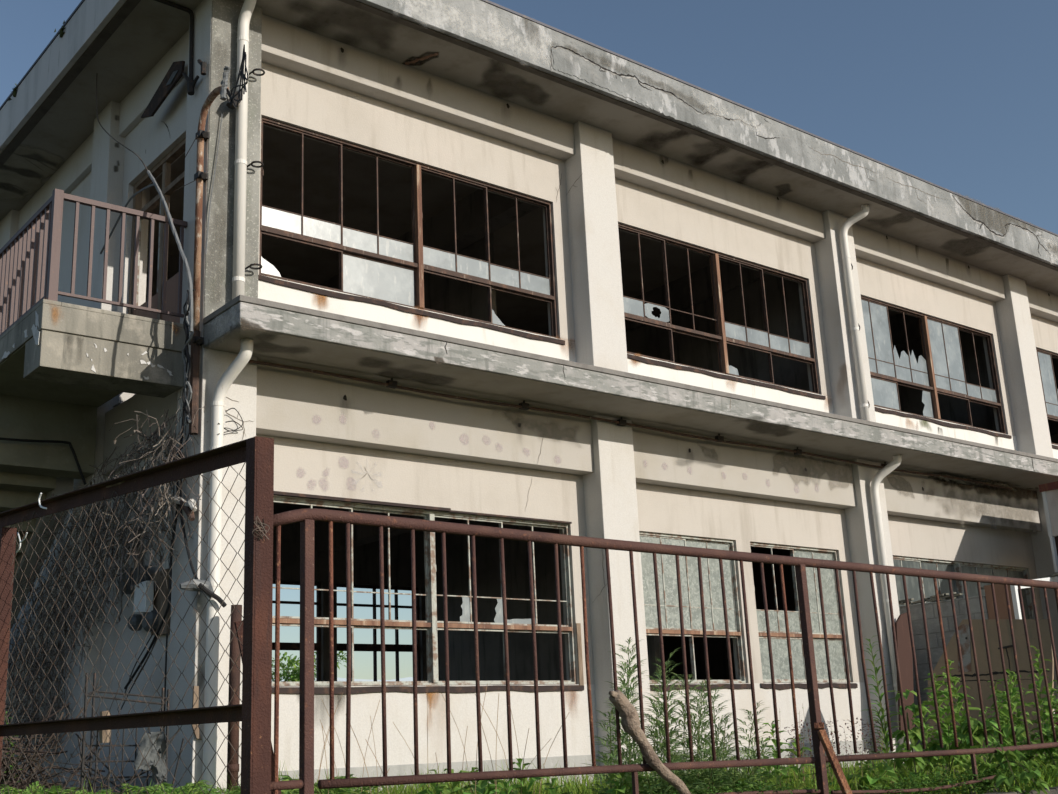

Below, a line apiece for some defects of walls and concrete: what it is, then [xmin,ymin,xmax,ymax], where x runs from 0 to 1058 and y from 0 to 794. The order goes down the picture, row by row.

damp [483,61,548,105]
crack [550,46,776,139]
crack [809,147,1051,261]
peeling [127,351,173,380]
spalling [927,473,1038,499]